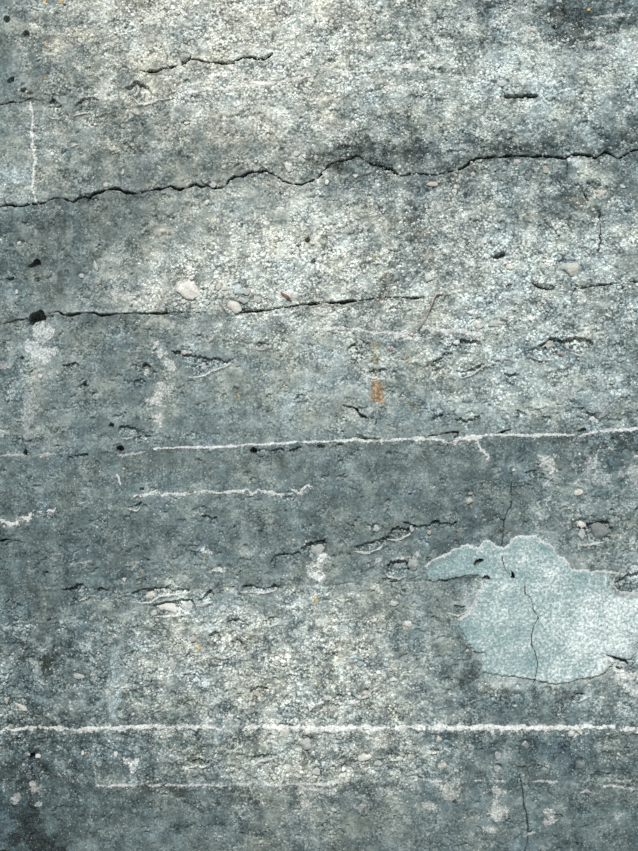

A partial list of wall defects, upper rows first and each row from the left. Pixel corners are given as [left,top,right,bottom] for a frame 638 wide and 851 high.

crack [0,149,638,253]
crack [531,281,638,295]
crack [241,296,425,313]
crack [48,310,200,318]
rust [370,375,385,407]